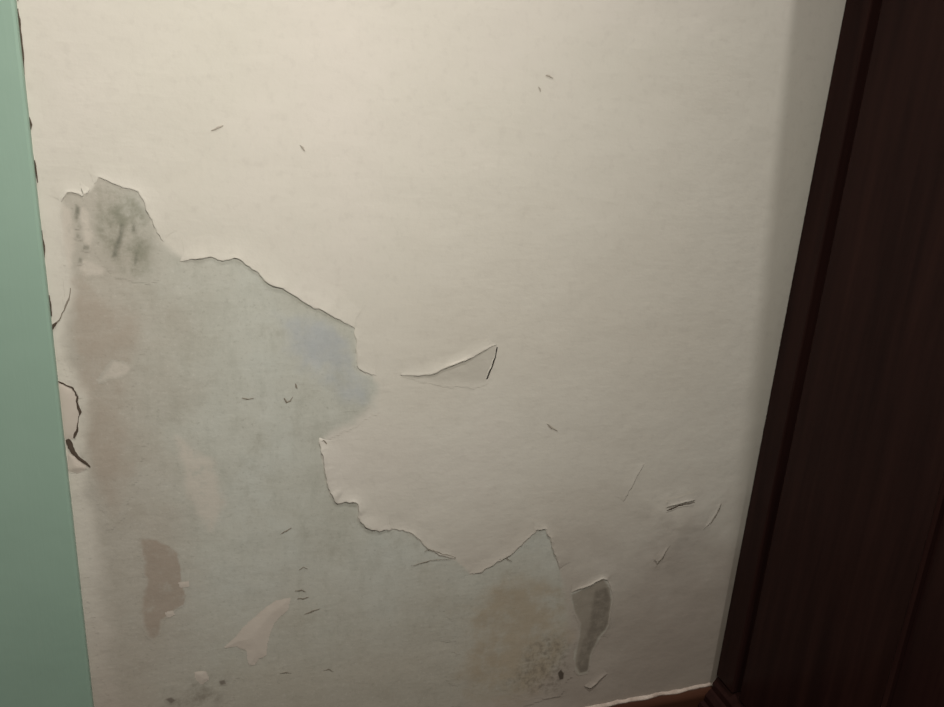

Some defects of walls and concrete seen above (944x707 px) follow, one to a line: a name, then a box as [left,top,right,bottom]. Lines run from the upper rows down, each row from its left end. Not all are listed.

water stain [60,184,161,530]
peeling [50,163,619,707]
water stain [161,669,240,707]
water stain [441,568,580,707]